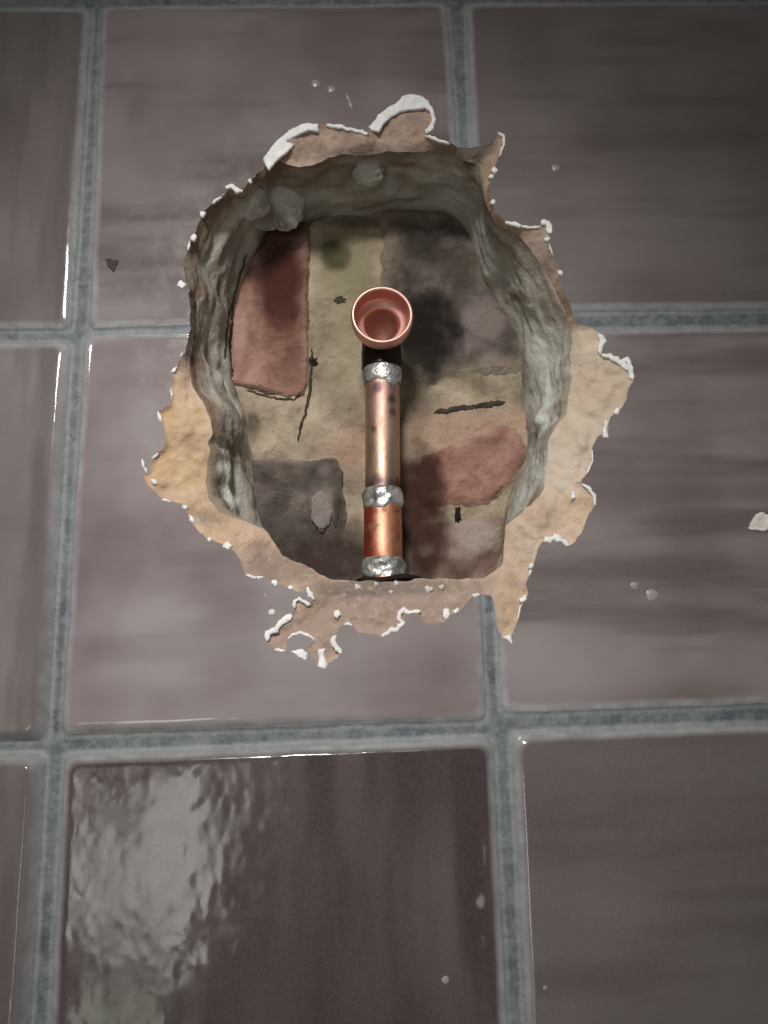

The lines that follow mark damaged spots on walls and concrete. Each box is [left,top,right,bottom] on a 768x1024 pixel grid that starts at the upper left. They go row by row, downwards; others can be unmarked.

crack [224,255,313,442]
spalling [141,94,634,669]
crack [434,400,505,414]